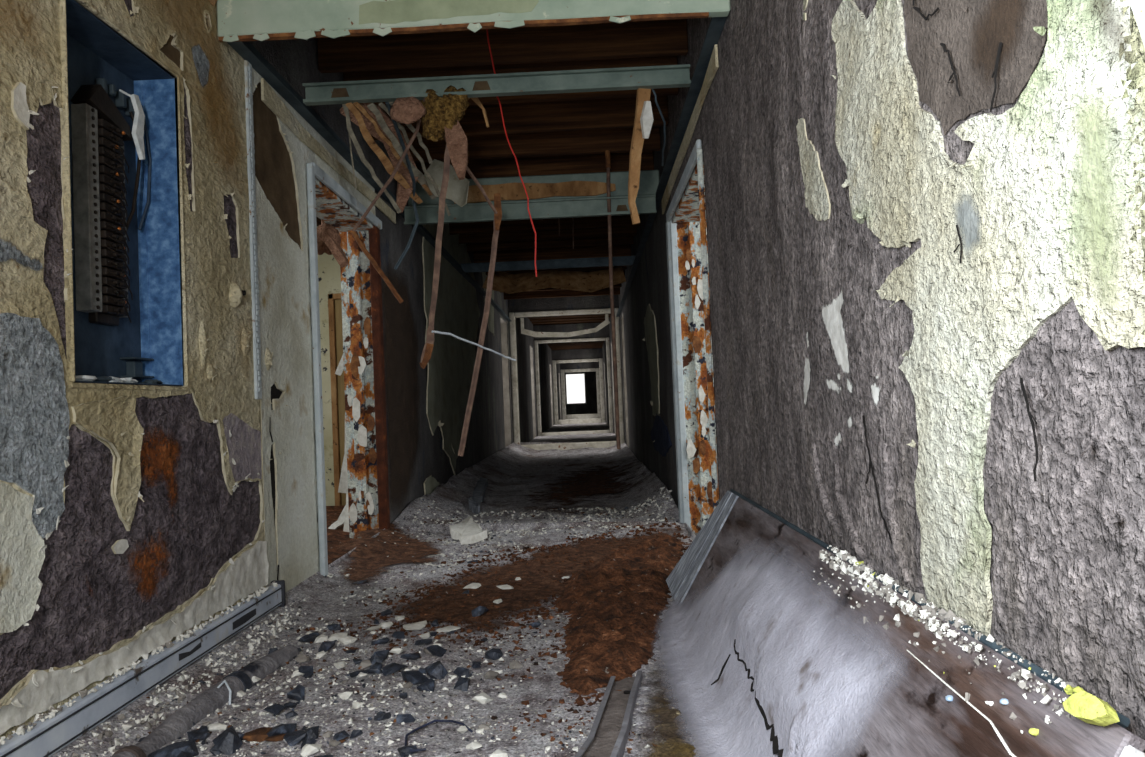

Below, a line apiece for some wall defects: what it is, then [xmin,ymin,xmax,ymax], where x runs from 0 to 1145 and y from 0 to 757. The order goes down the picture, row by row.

flaking render [160,33,210,212]
flaking render [0,82,269,735]
corrosion [140,432,179,506]
corrosion [368,226,390,529]
corrosion [670,219,690,527]
peeling [831,0,1145,739]